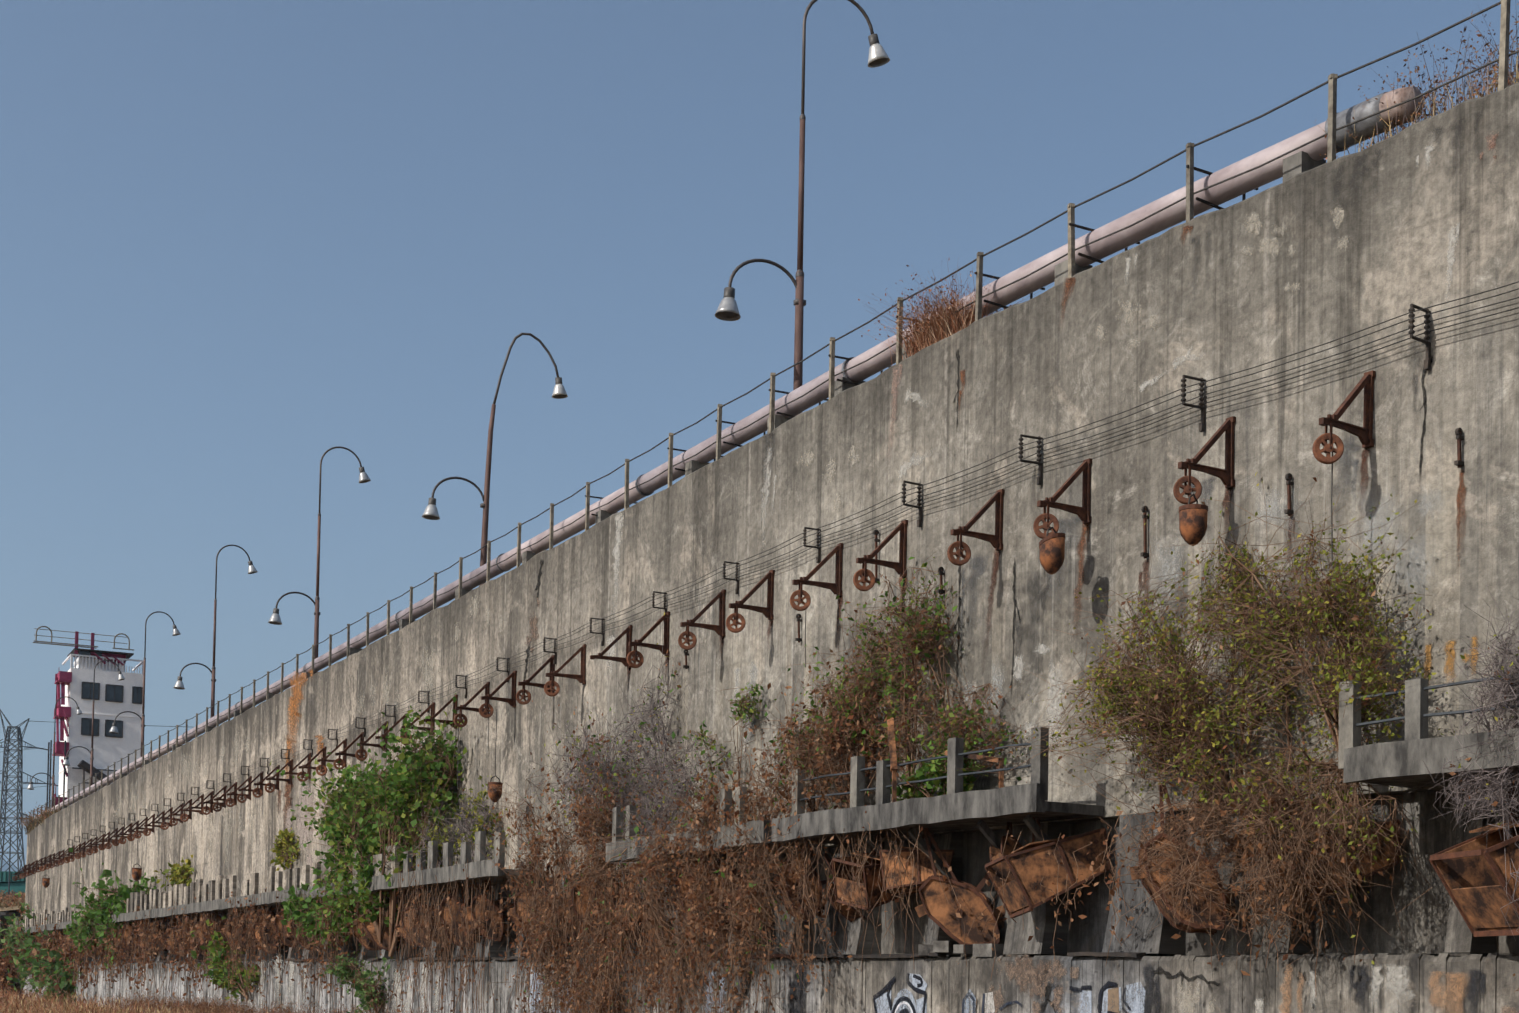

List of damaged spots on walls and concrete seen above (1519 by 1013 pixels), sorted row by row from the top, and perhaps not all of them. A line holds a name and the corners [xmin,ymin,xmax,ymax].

rust [1456,471,1466,529]
rust [277,670,313,812]
crack [1153,966,1220,989]